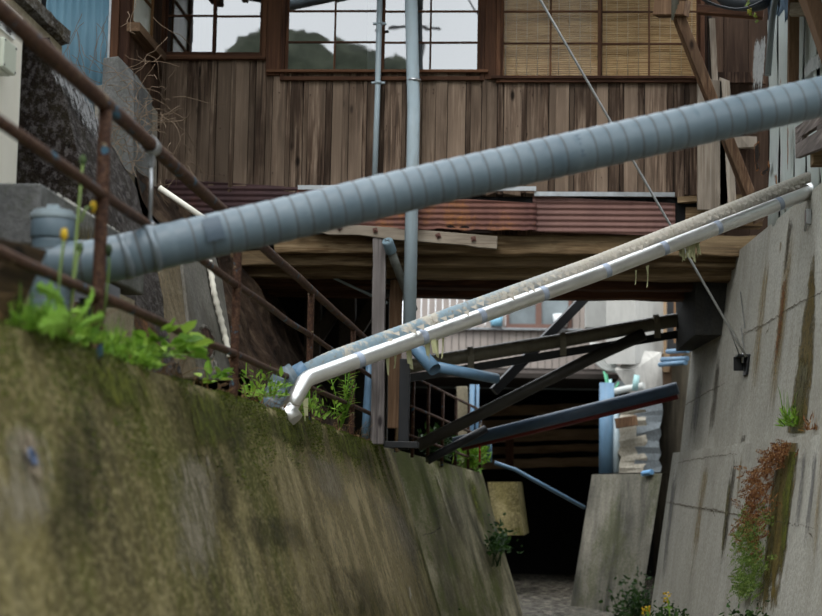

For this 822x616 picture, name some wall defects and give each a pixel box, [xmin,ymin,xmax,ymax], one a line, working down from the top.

crack [743,291,822,335]
damp [790,355,808,432]
damp [762,451,822,593]